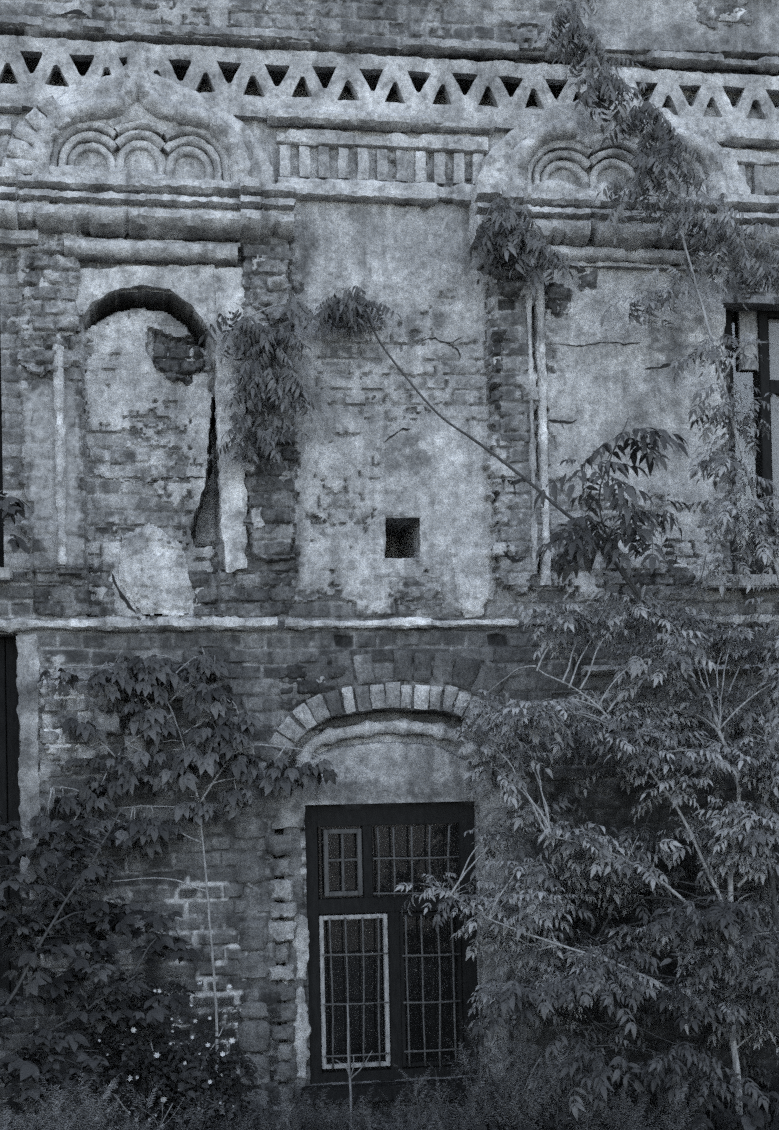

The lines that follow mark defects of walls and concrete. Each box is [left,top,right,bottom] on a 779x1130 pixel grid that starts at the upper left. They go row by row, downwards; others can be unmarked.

flaking render [17,240,84,377]
flaking render [152,329,206,383]
flaking render [486,328,530,442]
flaking render [86,438,175,486]
crack [161,392,255,577]
flaking render [388,579,443,610]